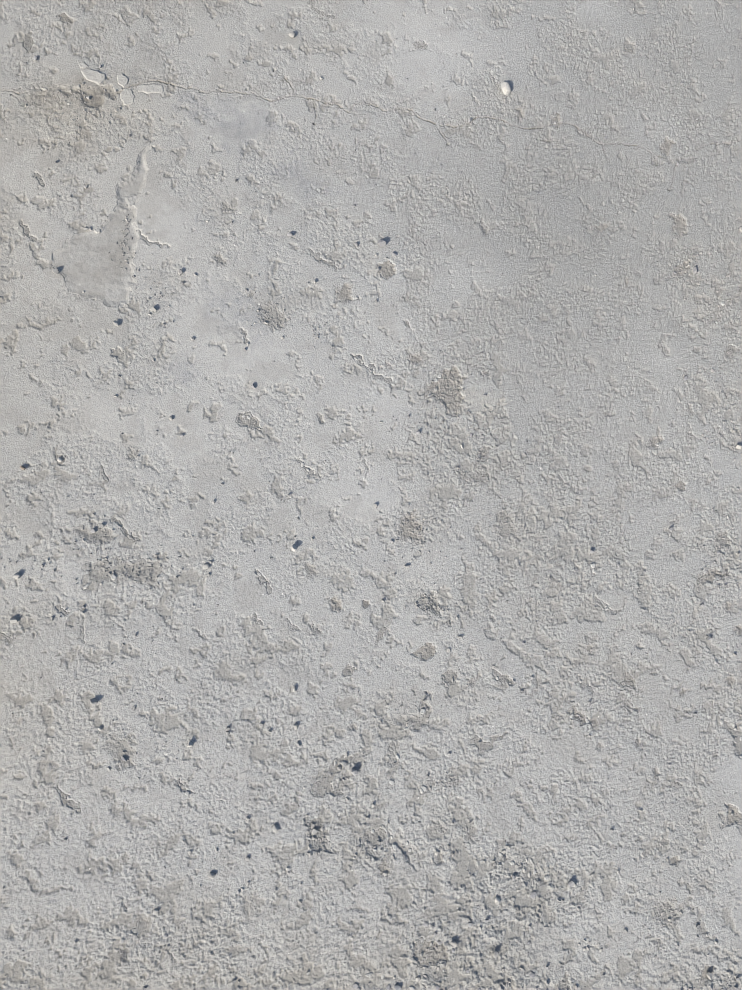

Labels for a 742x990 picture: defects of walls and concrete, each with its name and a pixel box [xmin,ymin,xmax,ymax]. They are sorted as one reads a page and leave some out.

crack [0,62,679,190]